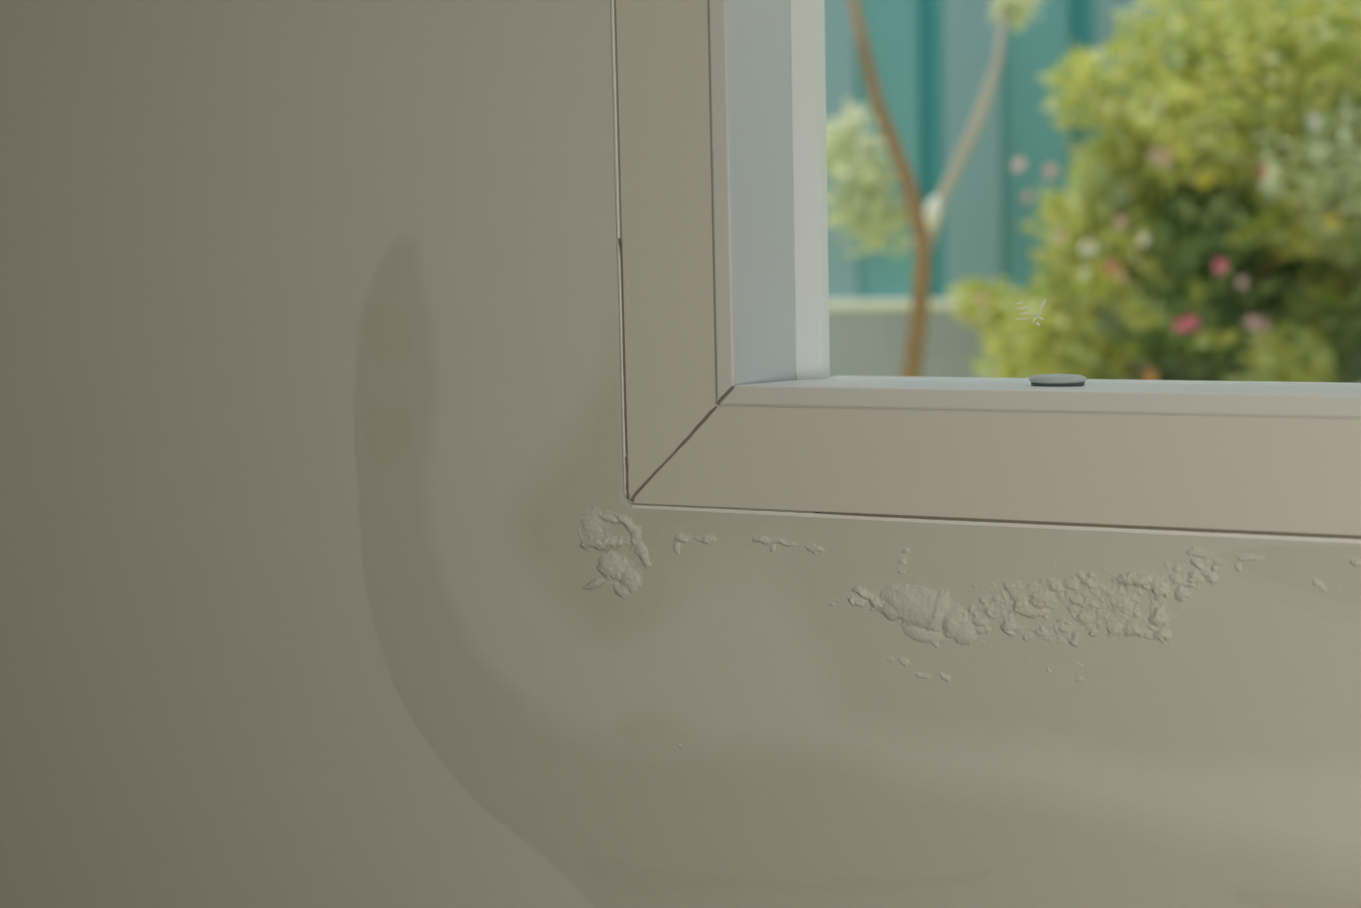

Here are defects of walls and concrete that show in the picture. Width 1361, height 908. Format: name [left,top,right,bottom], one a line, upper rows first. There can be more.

peeling [577,507,642,552]
water stain [353,230,1361,908]
peeling [1163,545,1228,602]